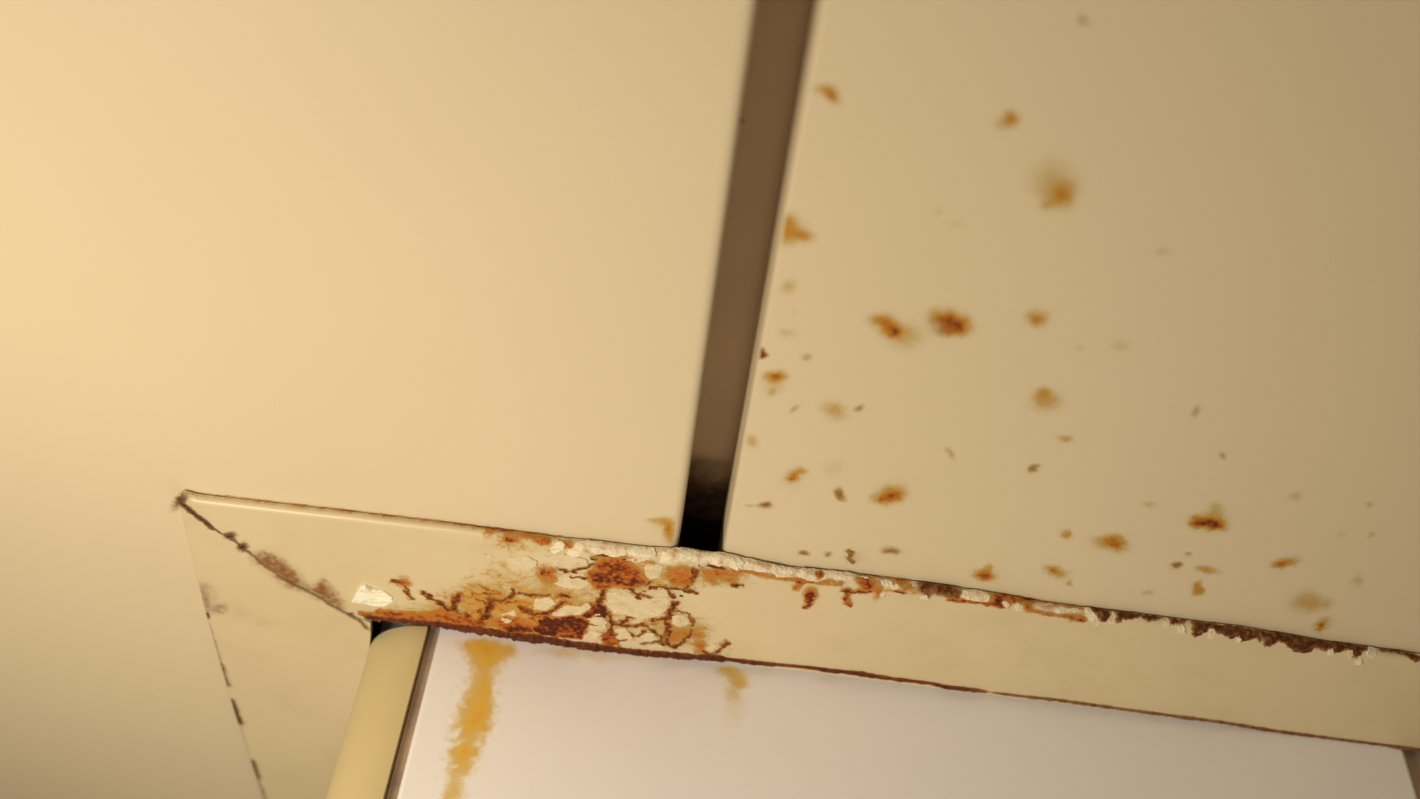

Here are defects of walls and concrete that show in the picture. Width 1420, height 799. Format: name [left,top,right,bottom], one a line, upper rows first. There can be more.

rust [819,86,837,102]
rust [1043,181,1073,208]
rust [782,216,810,242]
rust [872,315,909,340]
rust [930,311,971,337]
rust [874,487,905,504]
peeling [550,539,929,600]
peeling [960,589,1085,614]
rust [181,493,1420,799]